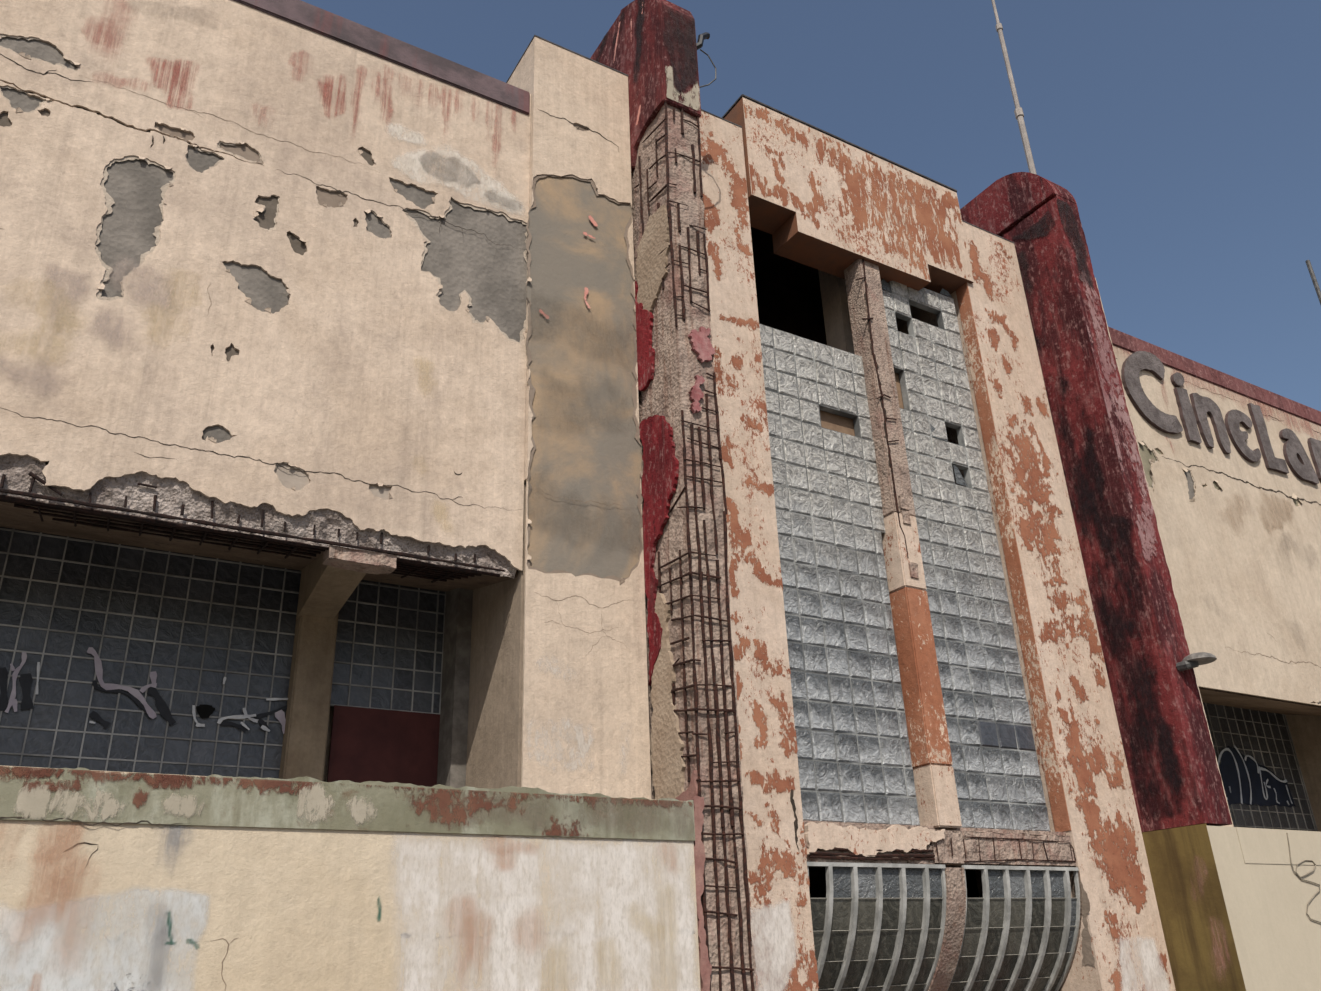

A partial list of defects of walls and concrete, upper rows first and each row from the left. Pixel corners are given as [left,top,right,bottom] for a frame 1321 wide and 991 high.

leakage [596,0,644,81]
leakage [664,8,697,92]
crack [1,54,520,249]
crack [1164,457,1321,505]
spalling [0,66,1076,991]
leakage [1046,377,1183,817]
peeling [997,394,1148,969]
rust [0,766,322,808]
rust [359,785,692,830]
rust [542,817,588,837]
peeling [1109,962,1124,991]
peeling [1157,945,1171,983]